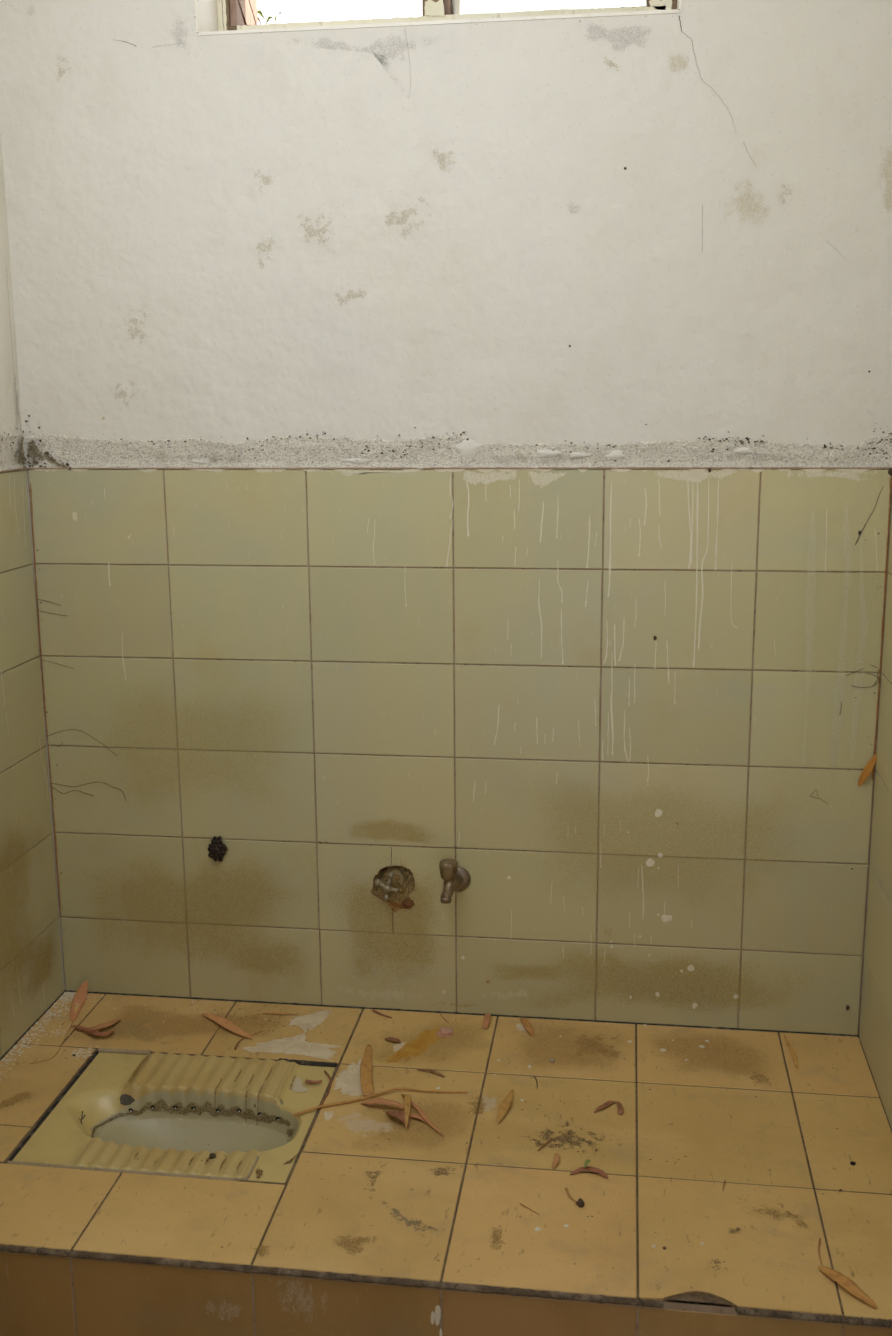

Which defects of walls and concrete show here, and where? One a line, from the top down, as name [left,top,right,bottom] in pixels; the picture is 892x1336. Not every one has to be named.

crack [679,16,756,166]
spalling [663,1291,737,1312]